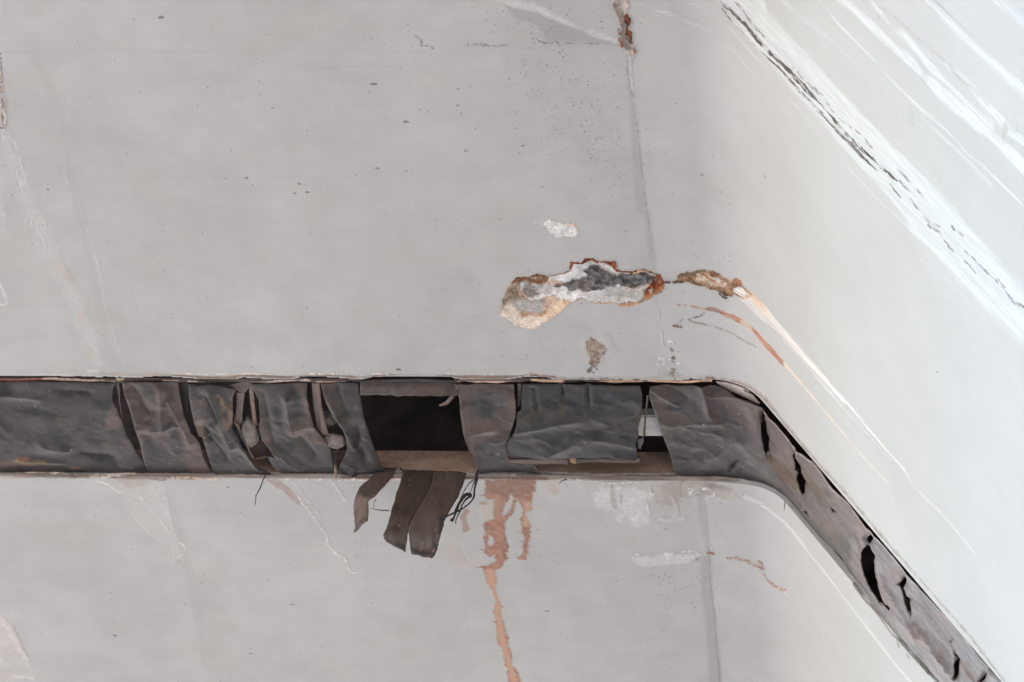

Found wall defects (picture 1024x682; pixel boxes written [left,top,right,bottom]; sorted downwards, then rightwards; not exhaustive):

crack [720,0,1024,309]
peeling [533,217,579,239]
spalling [498,256,752,330]
spalling [572,330,620,375]
rust [672,303,892,488]
peeling [0,474,230,488]
peeling [558,477,641,485]
rust [173,372,1007,682]
peeling [626,549,794,601]
peeling [852,581,939,682]